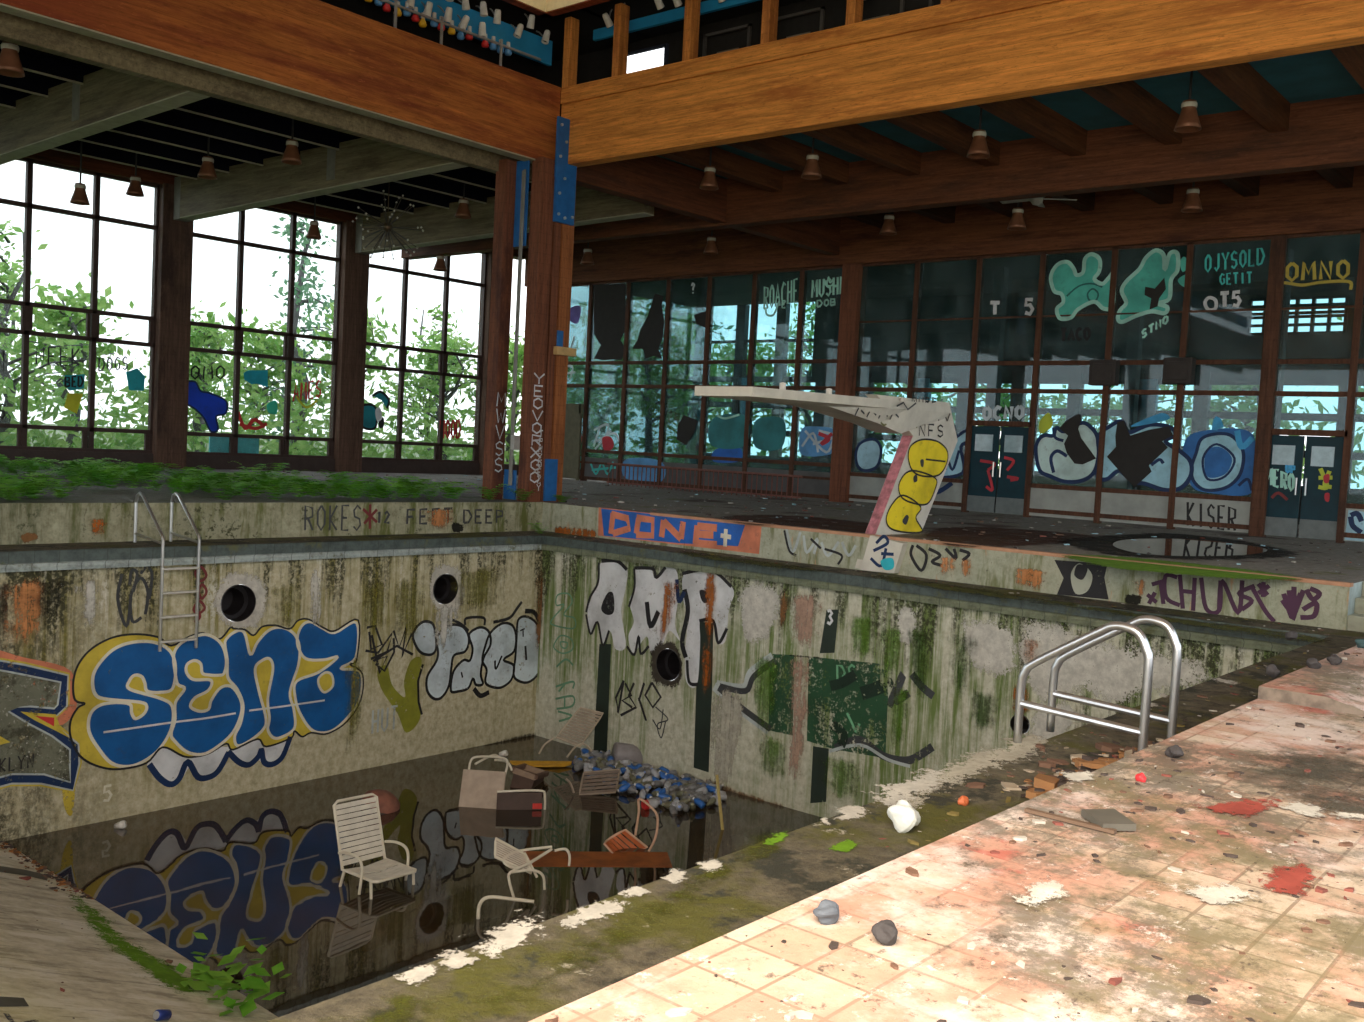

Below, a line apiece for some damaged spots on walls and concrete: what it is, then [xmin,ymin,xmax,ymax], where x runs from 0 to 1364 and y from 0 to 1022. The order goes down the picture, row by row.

damp [924,527,1301,560]
damp [0,584,8,623]
damp [37,581,95,623]
damp [274,585,294,626]
rust [702,573,716,690]
damp [346,658,363,742]
damp [754,595,821,779]
damp [852,617,927,747]
damp [952,637,997,727]
peeling [820,617,1238,825]
damp [826,759,854,798]